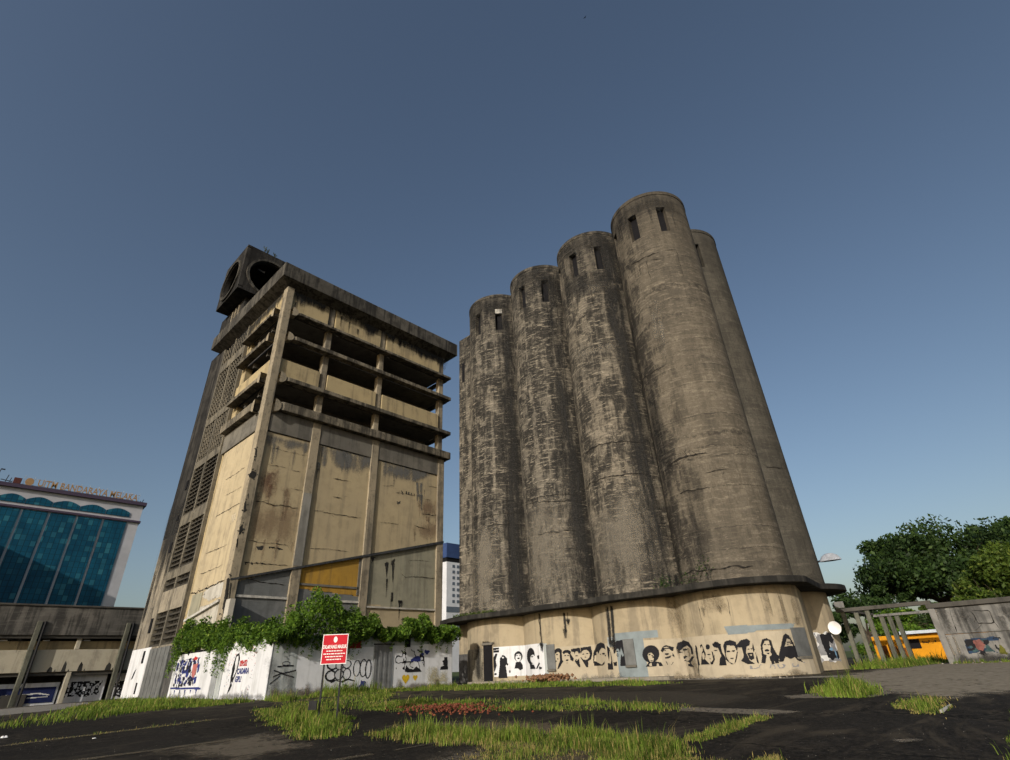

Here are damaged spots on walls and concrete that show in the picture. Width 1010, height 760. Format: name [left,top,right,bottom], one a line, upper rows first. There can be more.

leakage [230,292,446,367]
leakage [474,241,678,609]
leakage [317,447,371,473]
leakage [383,462,427,504]
leakage [606,606,615,648]